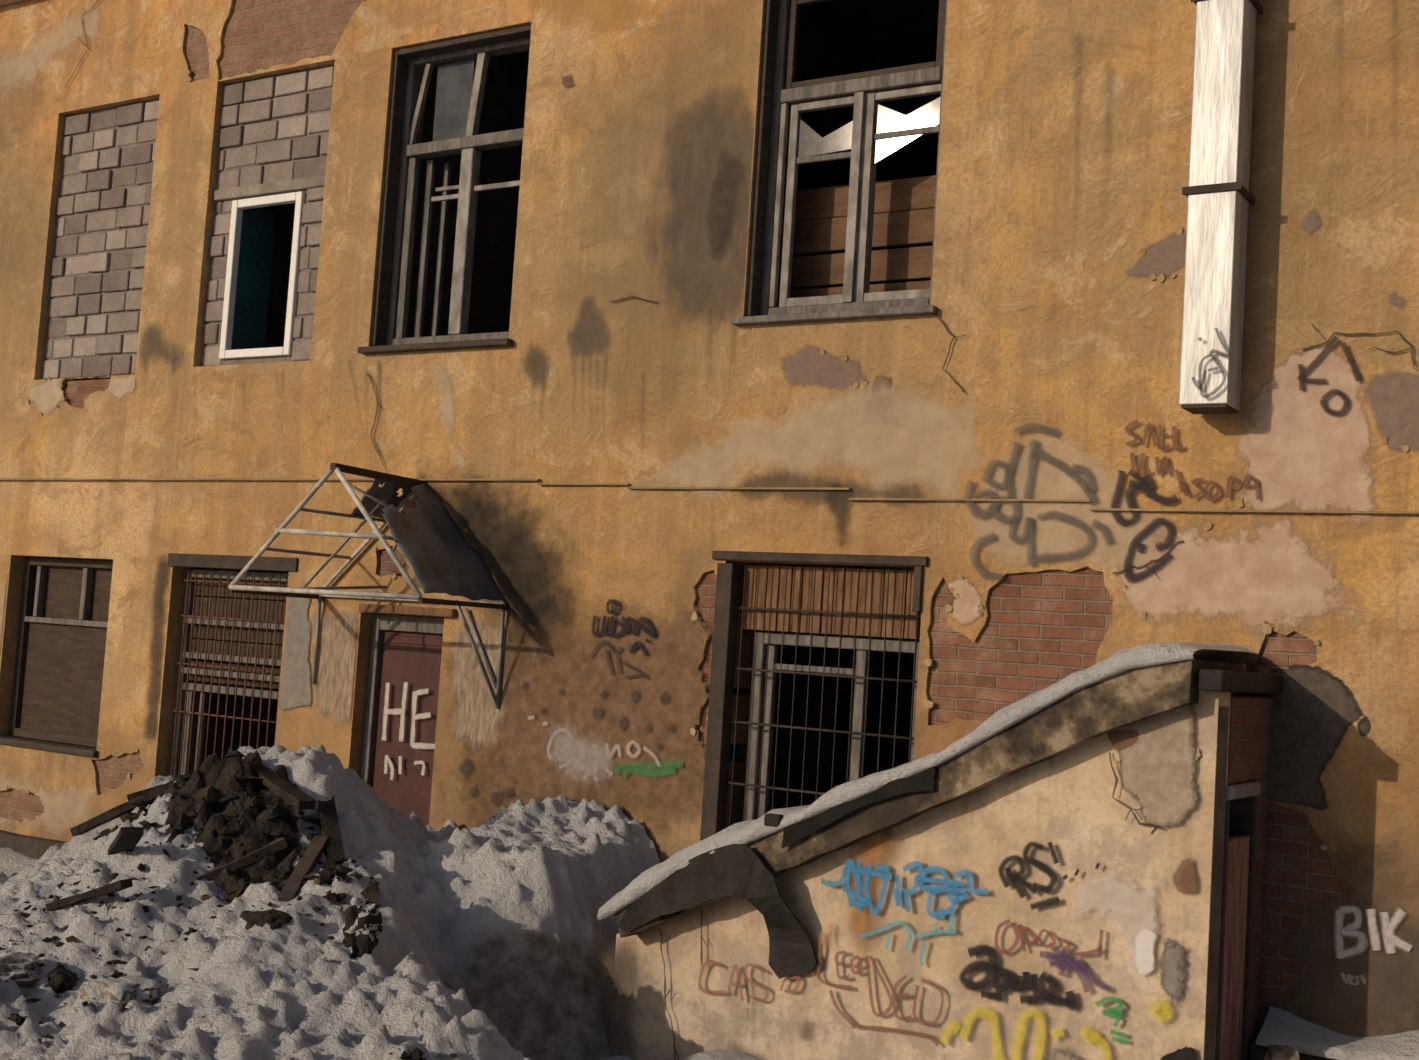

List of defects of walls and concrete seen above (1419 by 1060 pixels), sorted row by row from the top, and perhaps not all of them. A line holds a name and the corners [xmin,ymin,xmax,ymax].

flaking render [185,0,365,87]
water stain [665,102,754,318]
flaking render [27,376,135,416]
water stain [526,348,546,382]
water stain [571,302,607,353]
flaking render [923,348,1419,725]
flaking render [1108,705,1201,833]